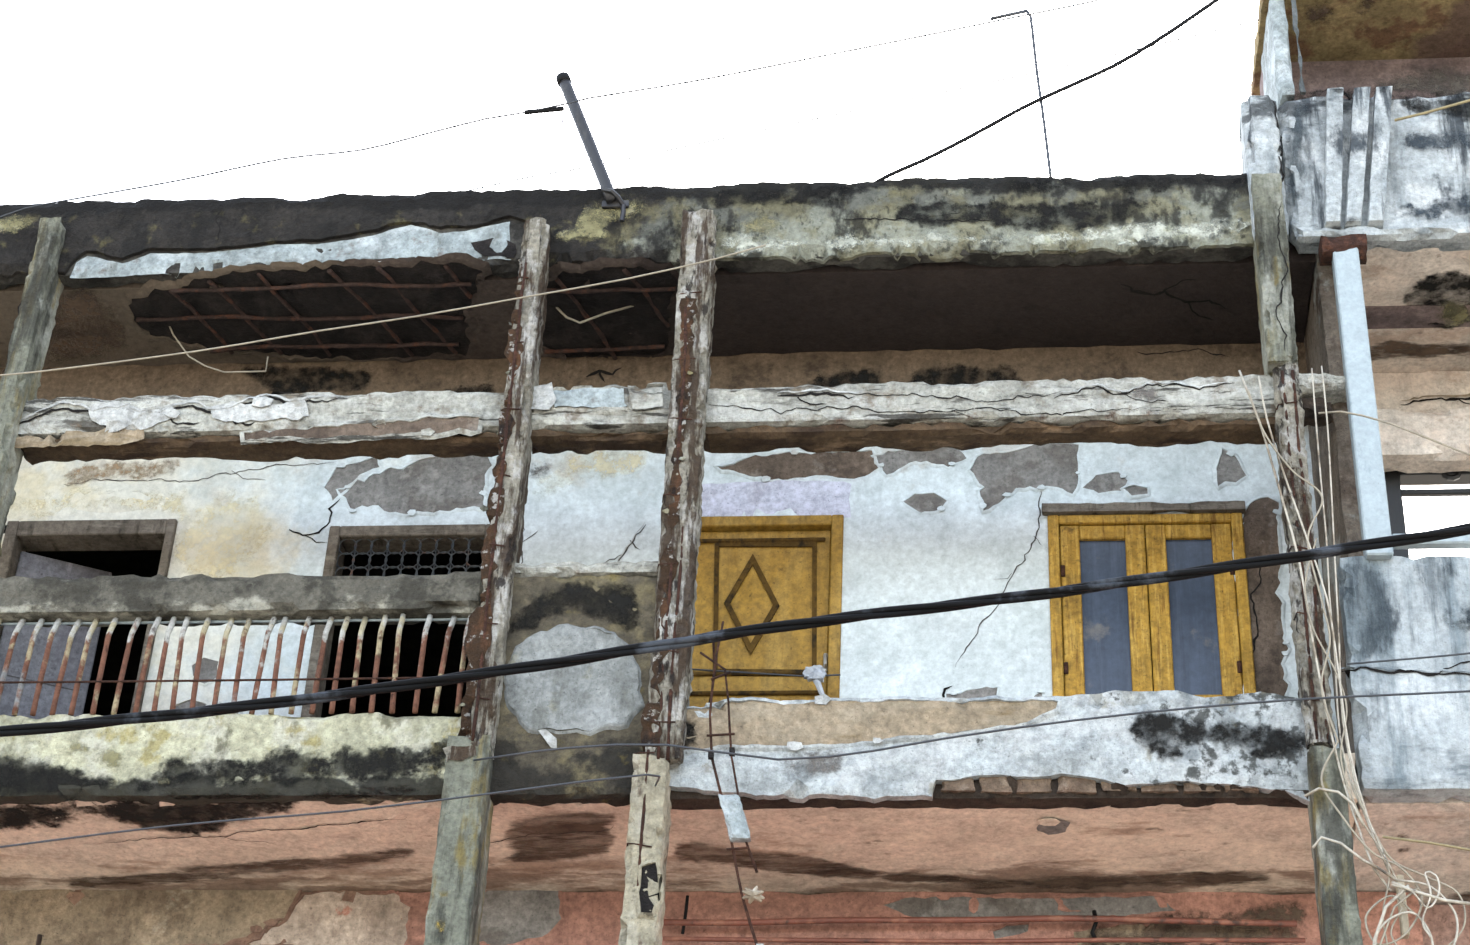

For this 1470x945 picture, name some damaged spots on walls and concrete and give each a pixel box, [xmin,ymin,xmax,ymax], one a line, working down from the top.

water stain [1286,69,1470,204]
water stain [829,176,1247,248]
crack [1401,393,1470,405]
spalling [14,428,144,448]
spalling [70,222,527,762]
peeling [713,443,1151,515]
spalling [503,256,1062,945]
crack [942,492,1042,697]
water stain [1130,713,1305,759]
water stain [0,739,448,836]
water stain [70,849,414,888]
peeling [479,890,565,945]